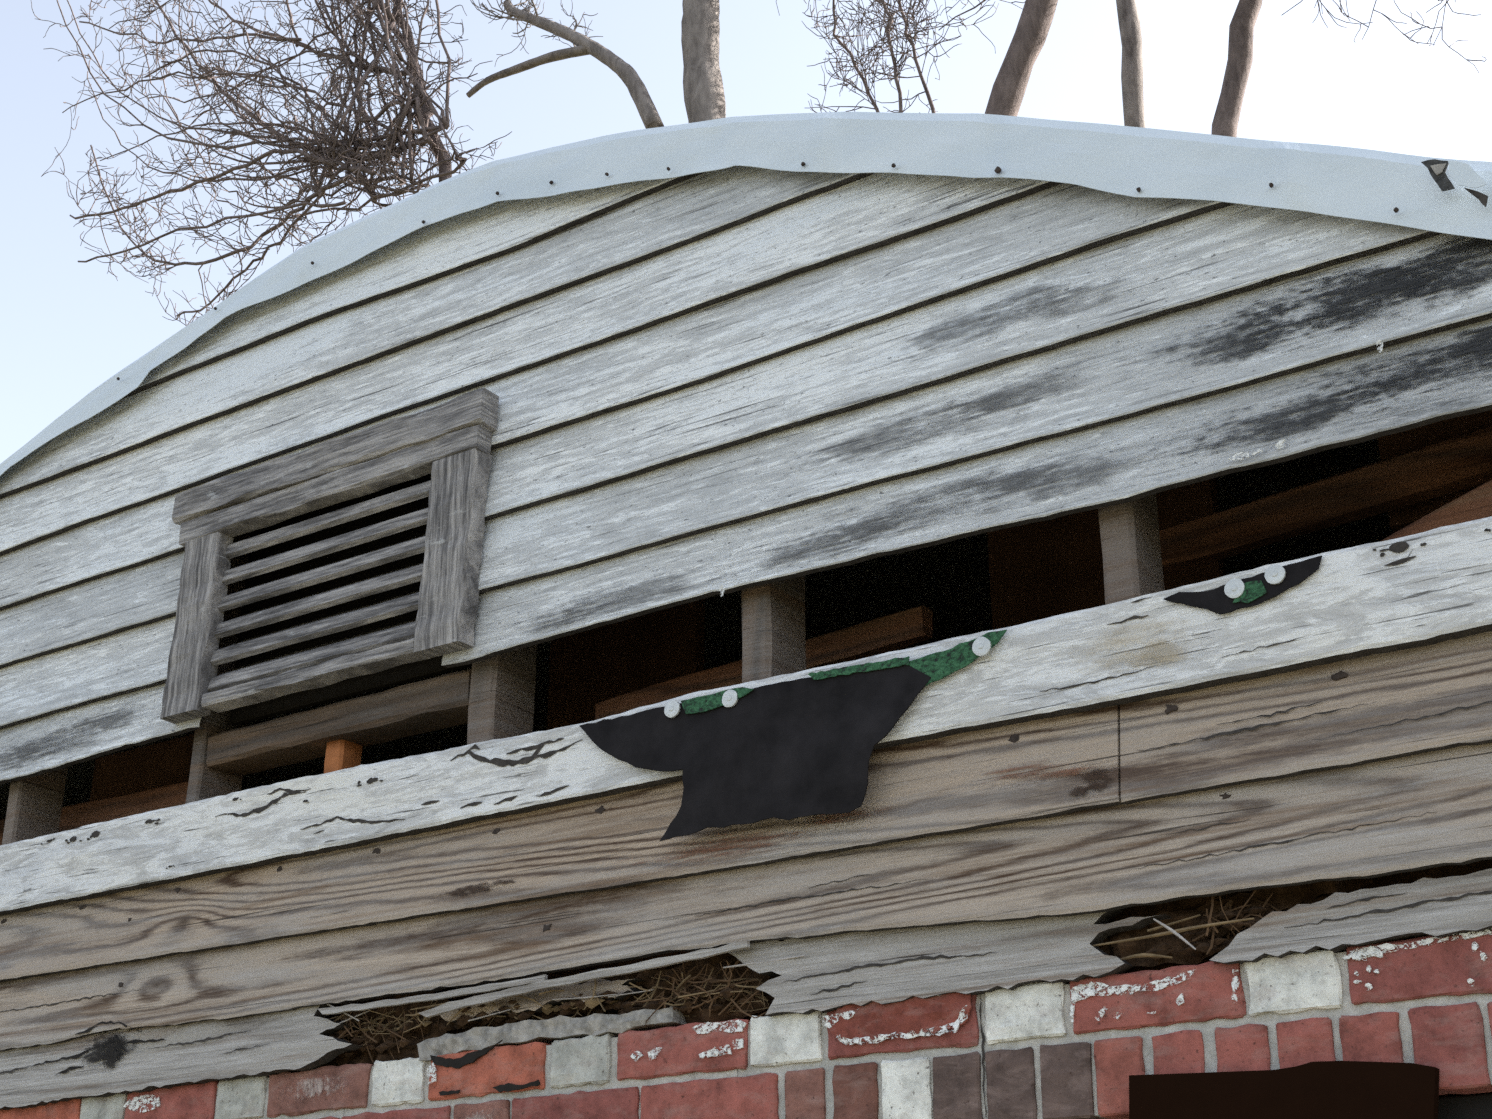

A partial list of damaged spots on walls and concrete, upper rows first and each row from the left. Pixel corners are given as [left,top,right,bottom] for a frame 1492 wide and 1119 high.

water stain [909,279,1125,350]
mould [1151,236,1492,371]
water stain [758,326,1492,569]
crack [215,738,583,834]
spalling [417,1006,686,1096]
peeling [699,1039,744,1058]